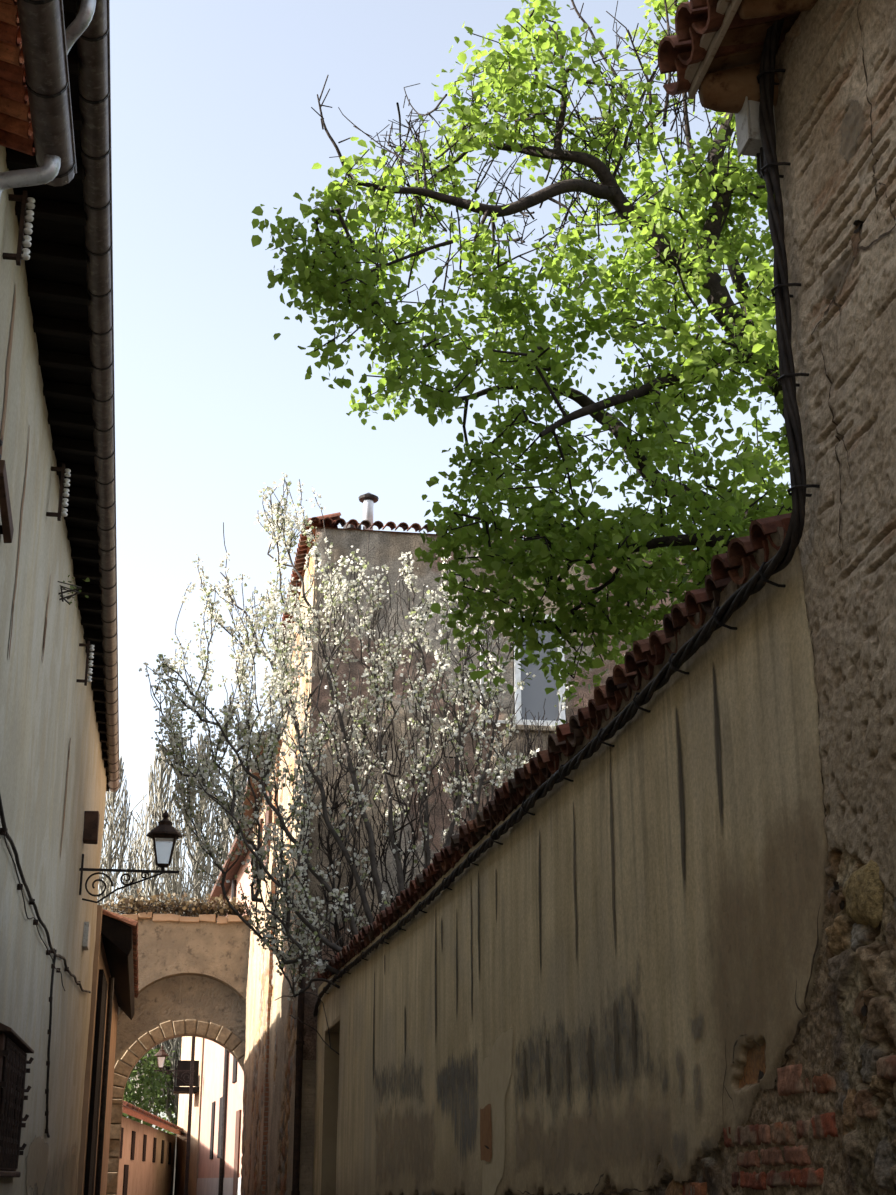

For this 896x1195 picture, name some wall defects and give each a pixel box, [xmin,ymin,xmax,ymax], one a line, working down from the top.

crack [811,0,896,566]
leakage [676,708,685,884]
leakage [713,665,723,823]
leakage [373,955,422,1103]
peeling [480,1029,513,1195]
leakage [515,986,702,1111]
flaking render [733,1034,836,1096]